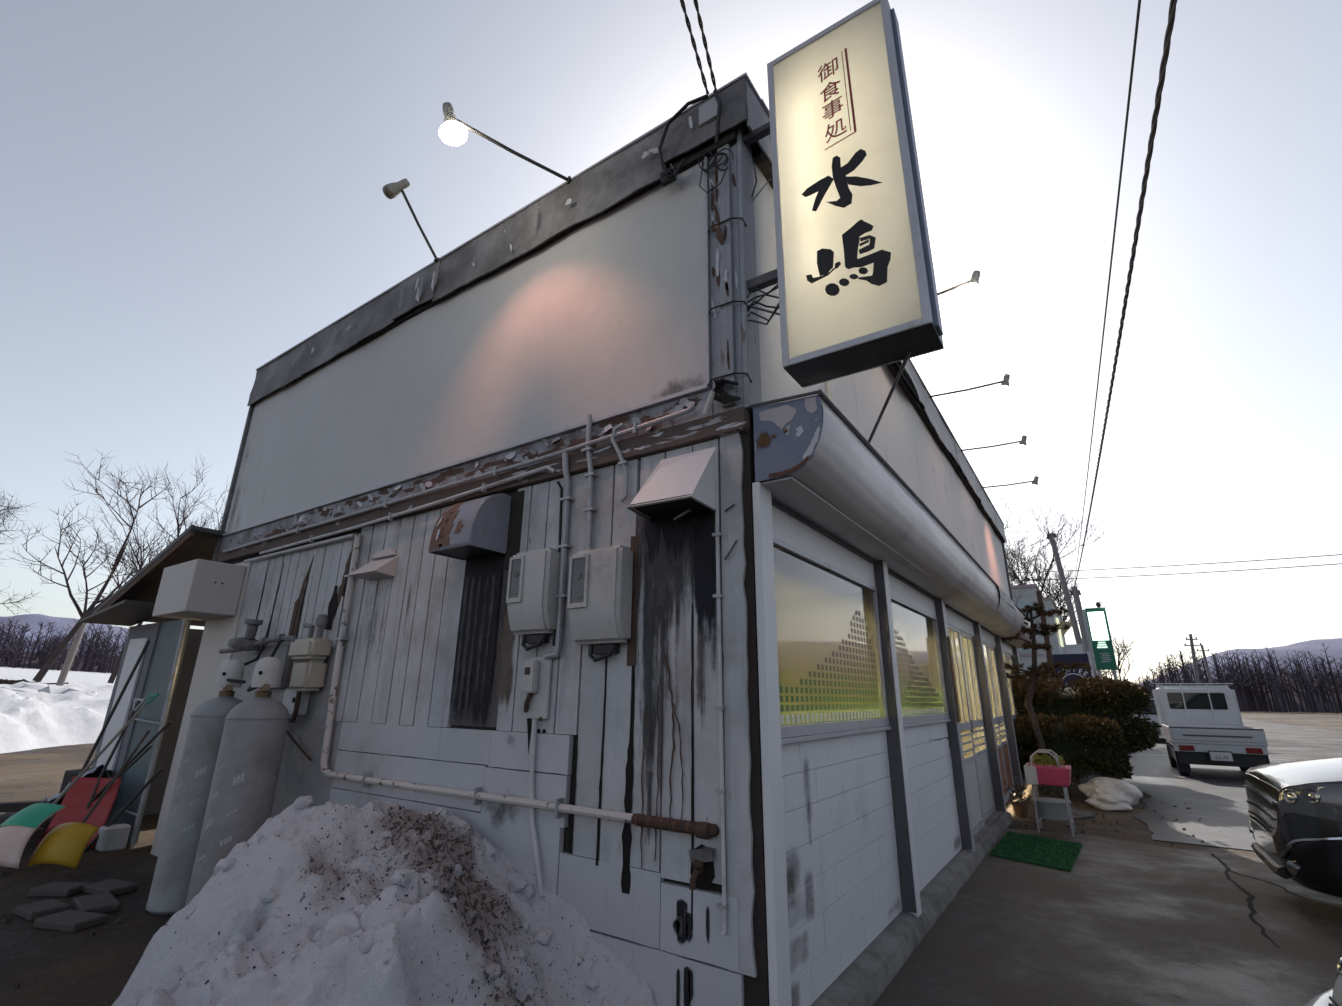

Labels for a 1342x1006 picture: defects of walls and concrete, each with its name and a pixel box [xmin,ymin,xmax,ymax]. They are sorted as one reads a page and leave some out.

peeling [264,377,821,538]
rust [769,456,808,478]
damp [636,510,716,838]
rust [634,813,697,835]
damp [786,857,797,903]
crack [1211,853,1306,948]